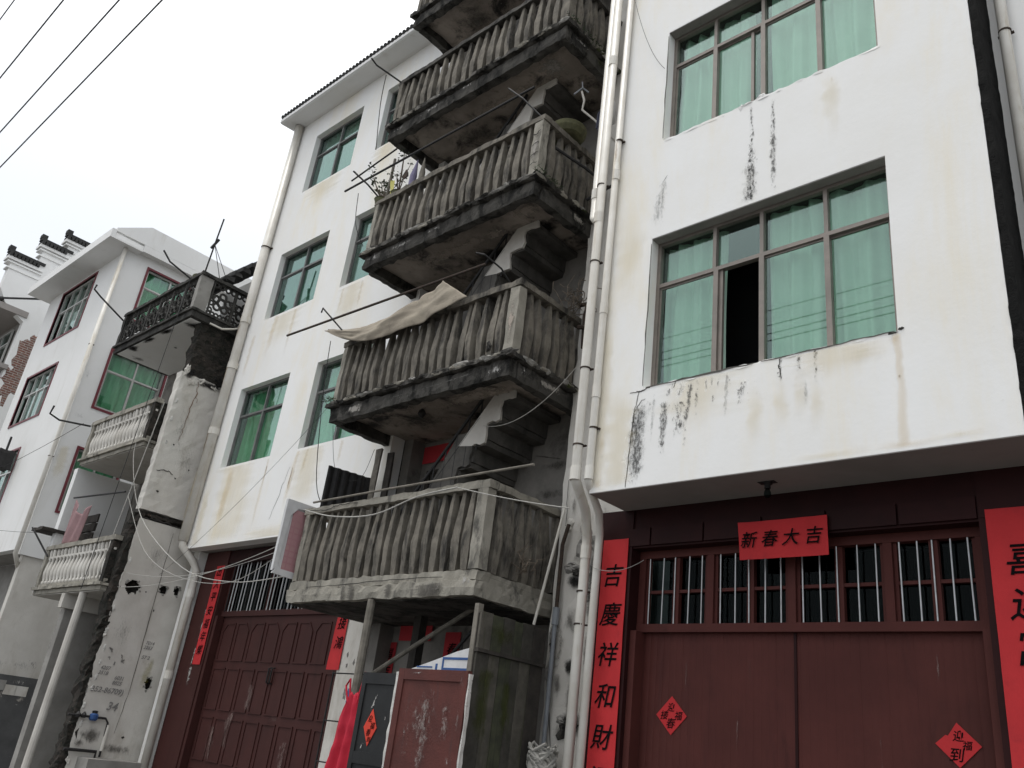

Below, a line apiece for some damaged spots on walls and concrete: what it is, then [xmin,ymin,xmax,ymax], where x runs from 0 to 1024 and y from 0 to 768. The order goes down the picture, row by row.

peeling [0,335,37,407]
damp [630,406,644,473]
damp [660,379,744,453]
spalling [125,579,181,598]